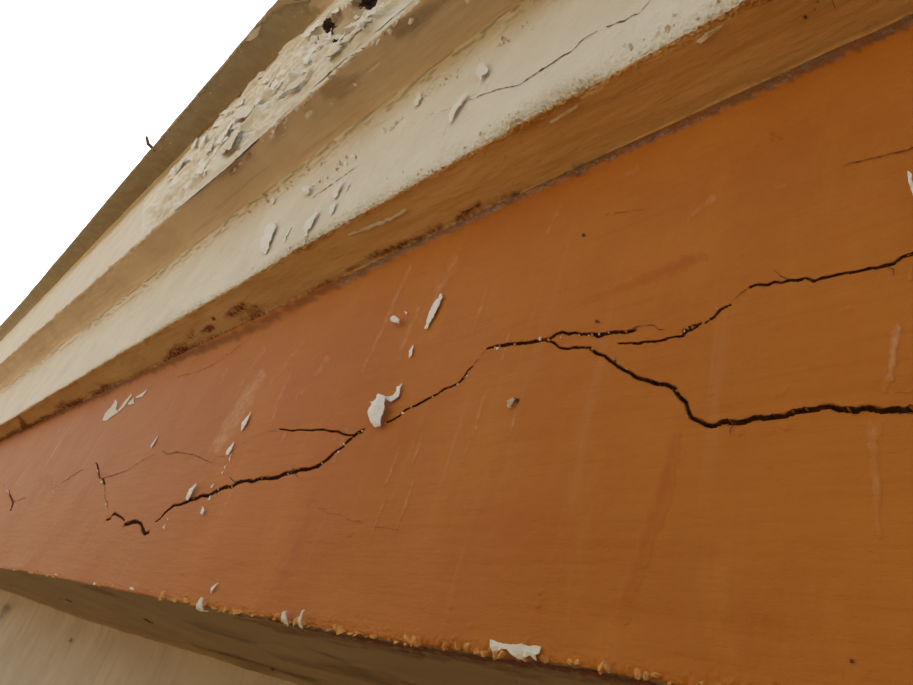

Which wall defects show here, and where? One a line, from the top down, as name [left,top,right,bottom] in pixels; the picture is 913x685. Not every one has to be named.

peeling [696,25,722,44]
peeling [448,90,469,123]
spalling [0,0,421,341]
peeling [424,293,443,329]
peeling [102,390,147,421]
peeling [367,383,402,428]
crack [50,252,913,536]
peeling [393,634,422,647]
peeling [436,639,549,664]
peeling [634,668,673,685]